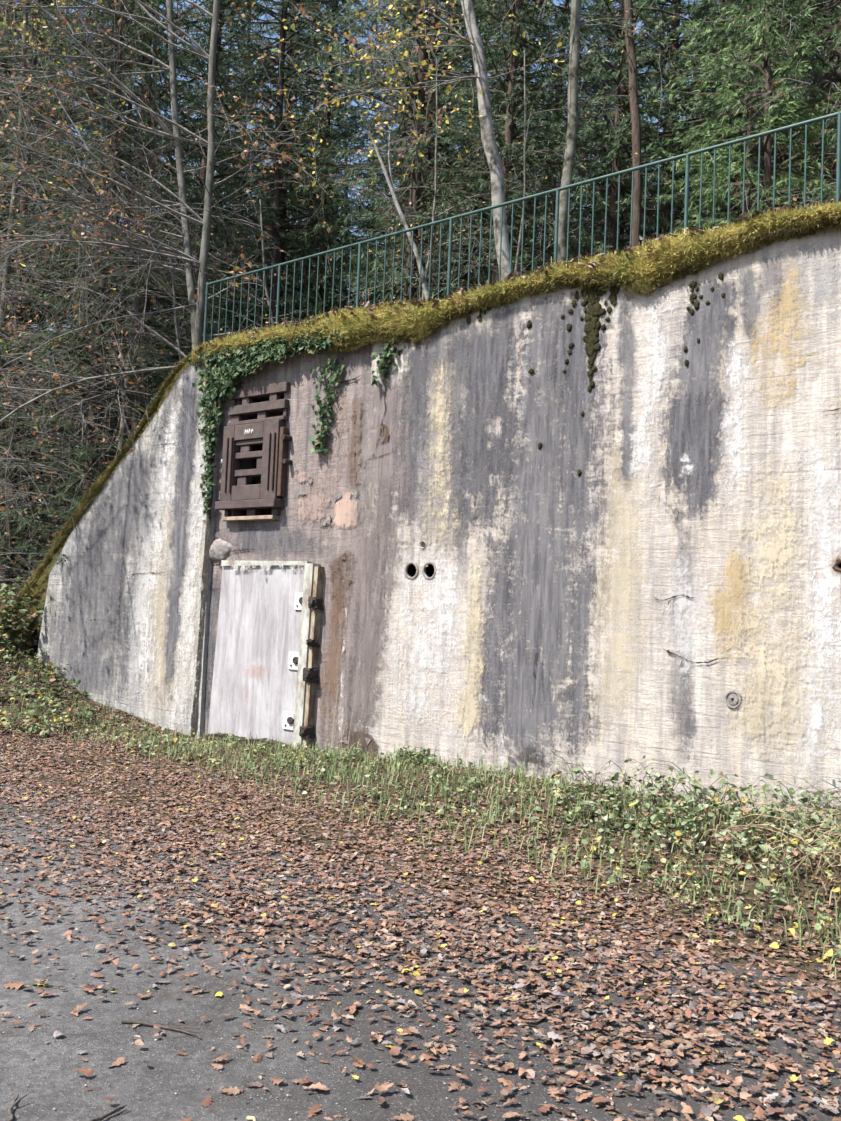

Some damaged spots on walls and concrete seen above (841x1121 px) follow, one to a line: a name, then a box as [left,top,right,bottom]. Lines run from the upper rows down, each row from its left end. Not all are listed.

leakage [35,367,221,721]
spalling [294,398,362,529]
leakage [340,248,841,773]